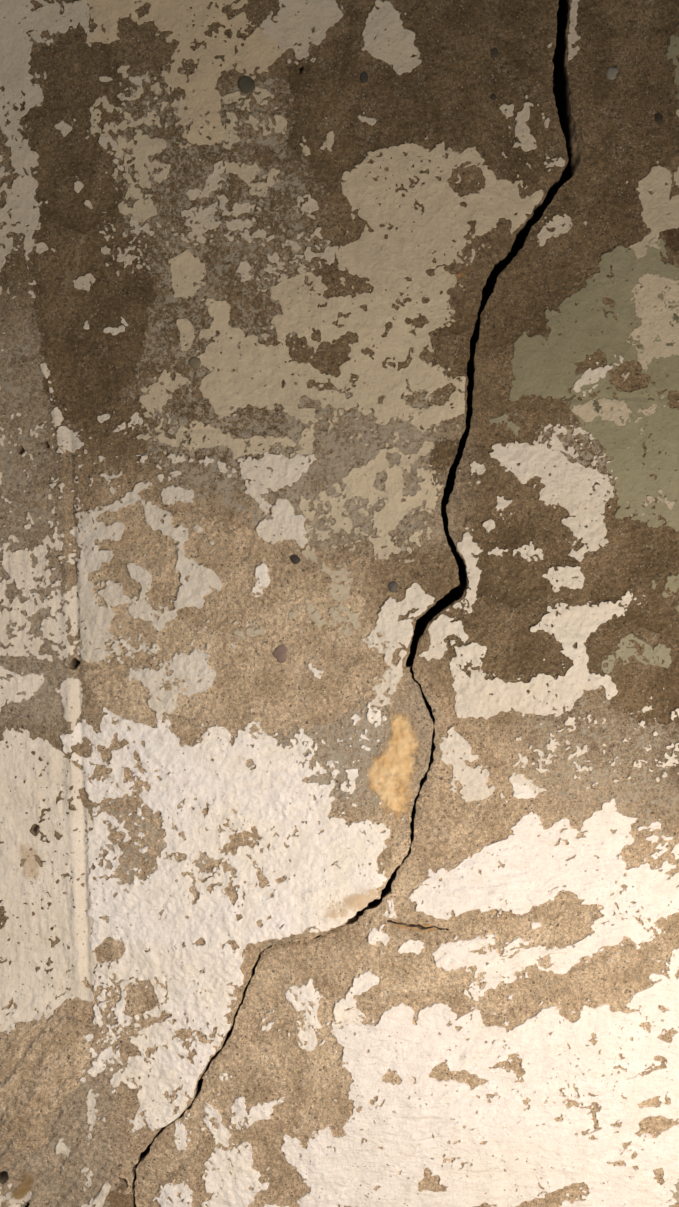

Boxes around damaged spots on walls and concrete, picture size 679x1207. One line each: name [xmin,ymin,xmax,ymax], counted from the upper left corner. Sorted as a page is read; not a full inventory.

peeling [159,160,280,299]
peeling [176,318,195,351]
peeling [468,461,486,484]
peeling [161,485,194,507]
crack [118,0,580,1207]
peeling [0,666,45,712]
peeling [509,714,606,799]
peeling [633,739,679,782]
peeling [340,766,358,807]
peeling [637,819,679,860]
peeling [86,1089,106,1146]
peeling [0,1171,32,1207]